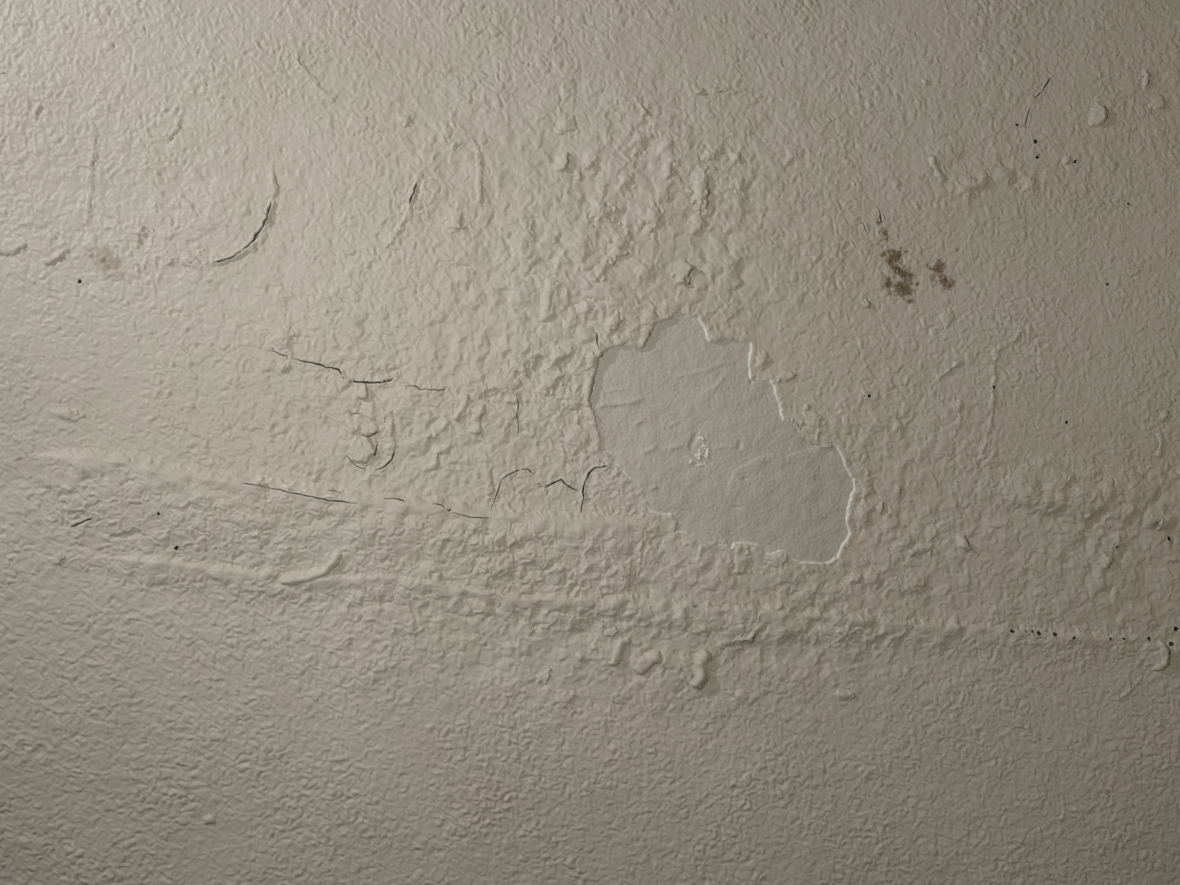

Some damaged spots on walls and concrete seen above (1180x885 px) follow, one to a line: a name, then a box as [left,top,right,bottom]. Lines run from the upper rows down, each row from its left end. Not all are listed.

crack [241,347,613,522]